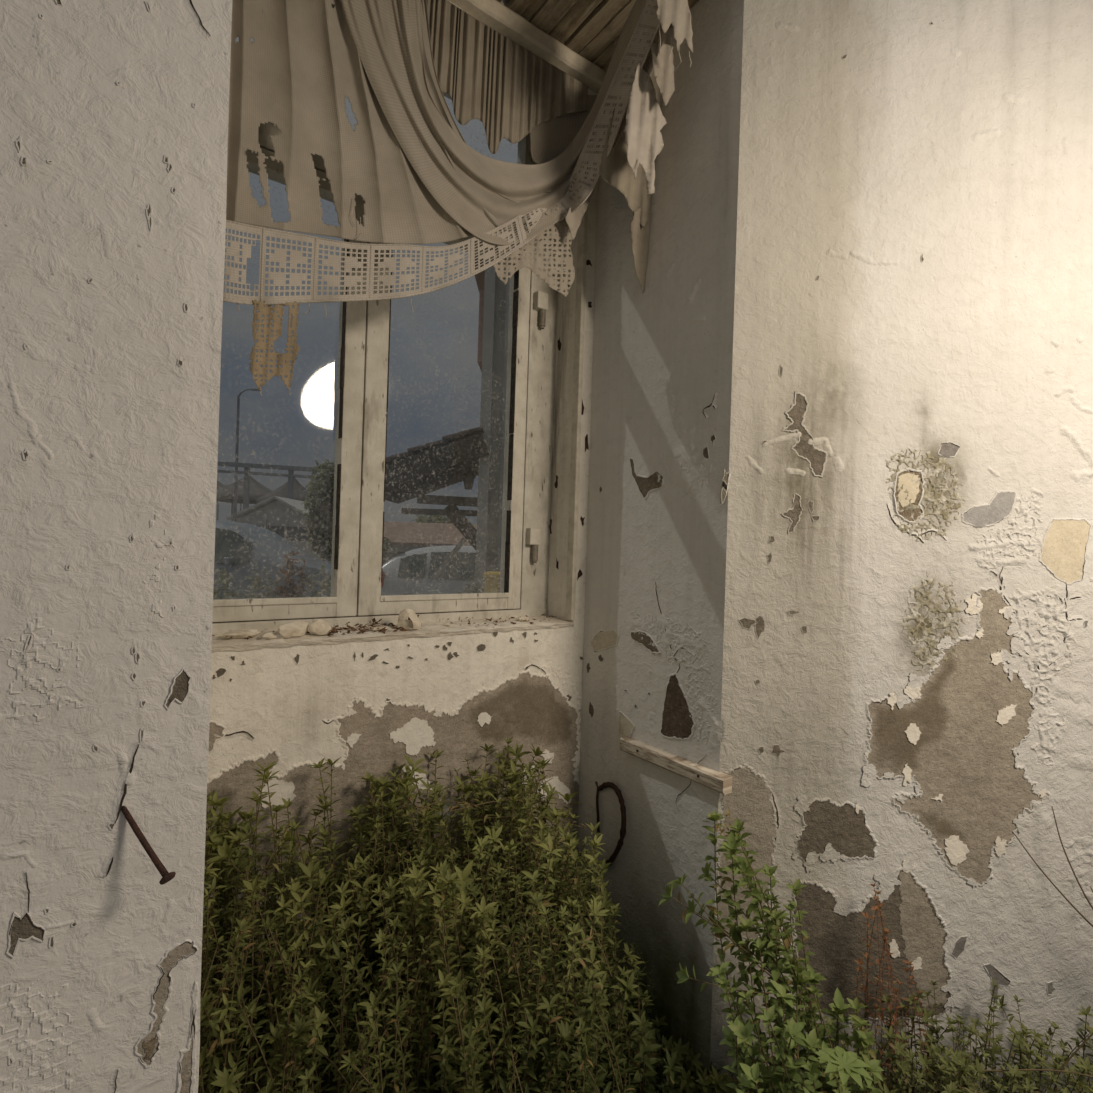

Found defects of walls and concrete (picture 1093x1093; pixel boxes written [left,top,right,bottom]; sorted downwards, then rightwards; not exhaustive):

crack [183,0,211,39]
peeling [782,391,827,478]
peeling [352,641,460,669]
peeling [579,629,661,674]
flaking render [660,673,697,741]
peeling [739,615,765,639]
flaking render [861,441,1092,888]
flaking render [205,669,595,919]
flaking render [711,763,778,941]
peeling [5,907,55,958]
flaking render [780,794,968,1023]
peeling [134,939,198,1068]